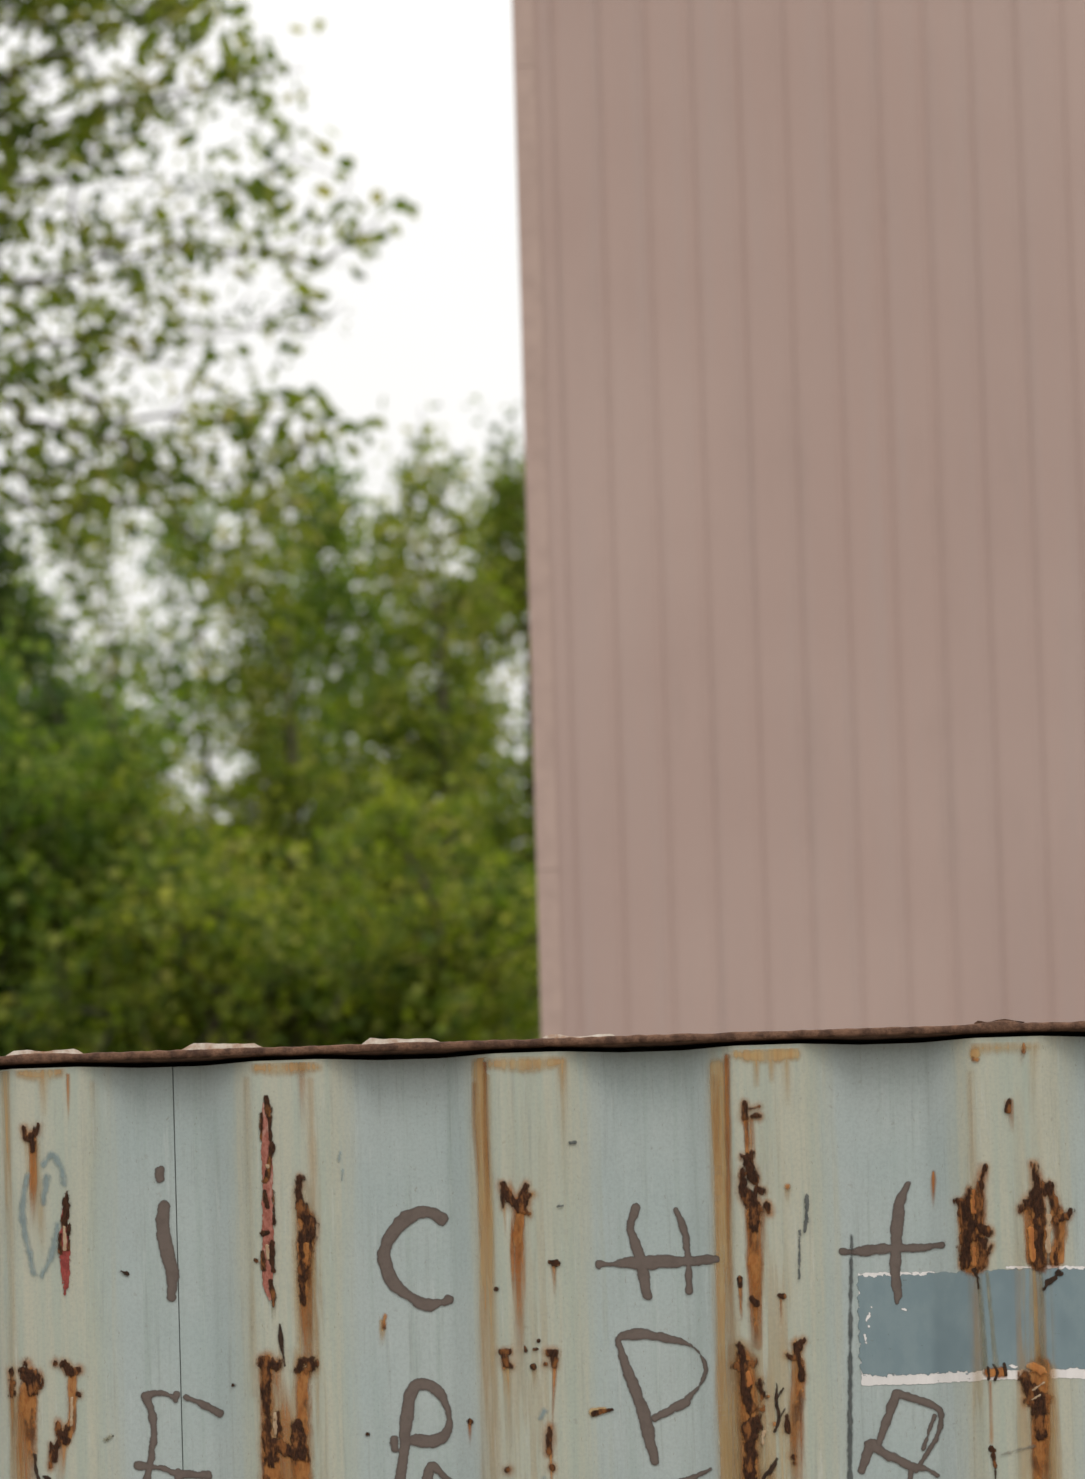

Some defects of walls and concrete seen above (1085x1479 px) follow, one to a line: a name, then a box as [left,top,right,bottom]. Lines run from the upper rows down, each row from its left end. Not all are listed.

corrosion [8,1359,82,1479]
corrosion [258,1174,320,1479]
corrosion [474,1057,564,1330]
corrosion [498,1339,558,1405]
corrosion [546,1425,555,1479]
corrosion [710,1048,806,1479]
corrosion [953,1164,998,1393]
corrosion [1018,1162,1073,1479]